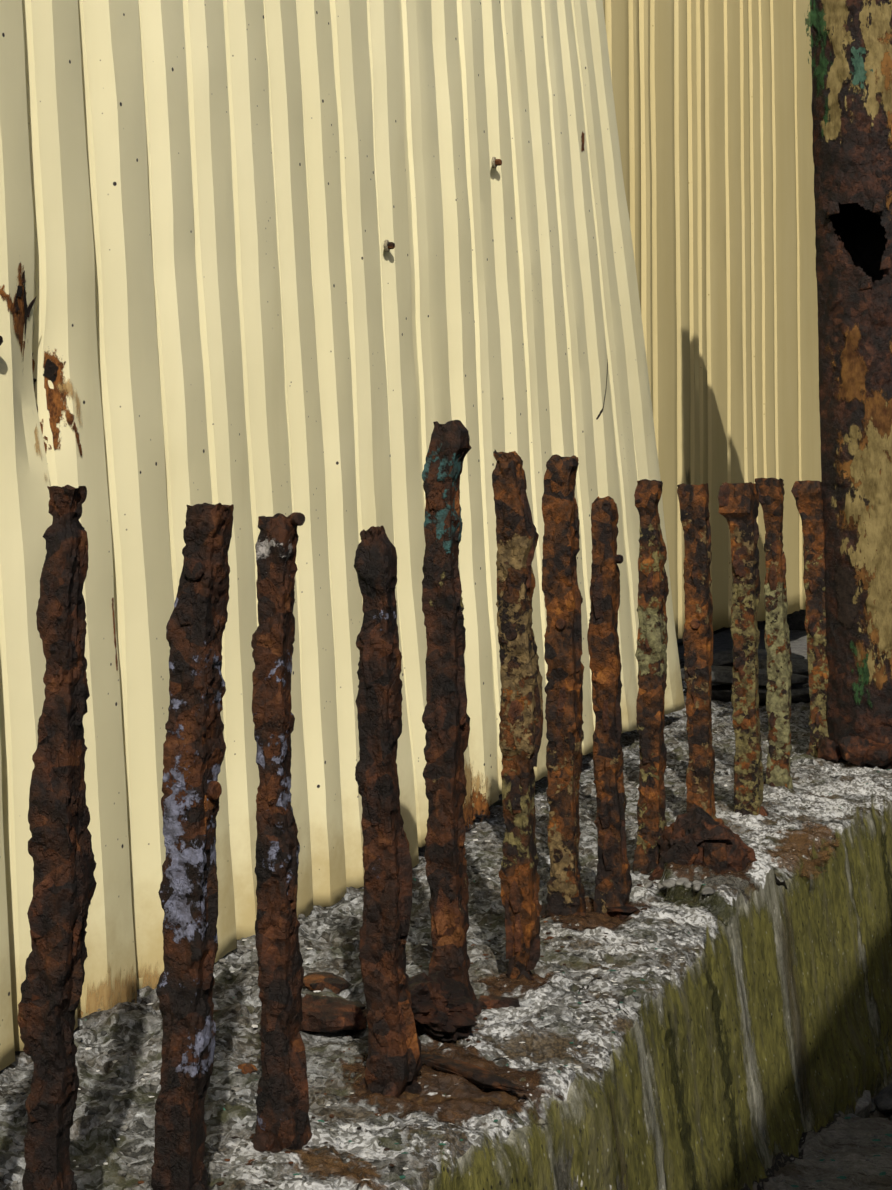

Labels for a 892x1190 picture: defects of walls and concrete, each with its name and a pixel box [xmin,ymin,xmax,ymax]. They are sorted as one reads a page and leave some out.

peeling [805,0,892,150]
corrosion [507,478,535,595]
corrosion [573,566,619,672]
corrosion [435,645,467,737]
corrosion [27,876,55,938]
corrosion [202,860,218,990]
corrosion [540,896,652,932]
damp [881,832,892,921]
corrosion [331,987,564,1126]
damp [665,1012,700,1190]
damp [706,954,741,1186]
damp [782,894,829,1126]